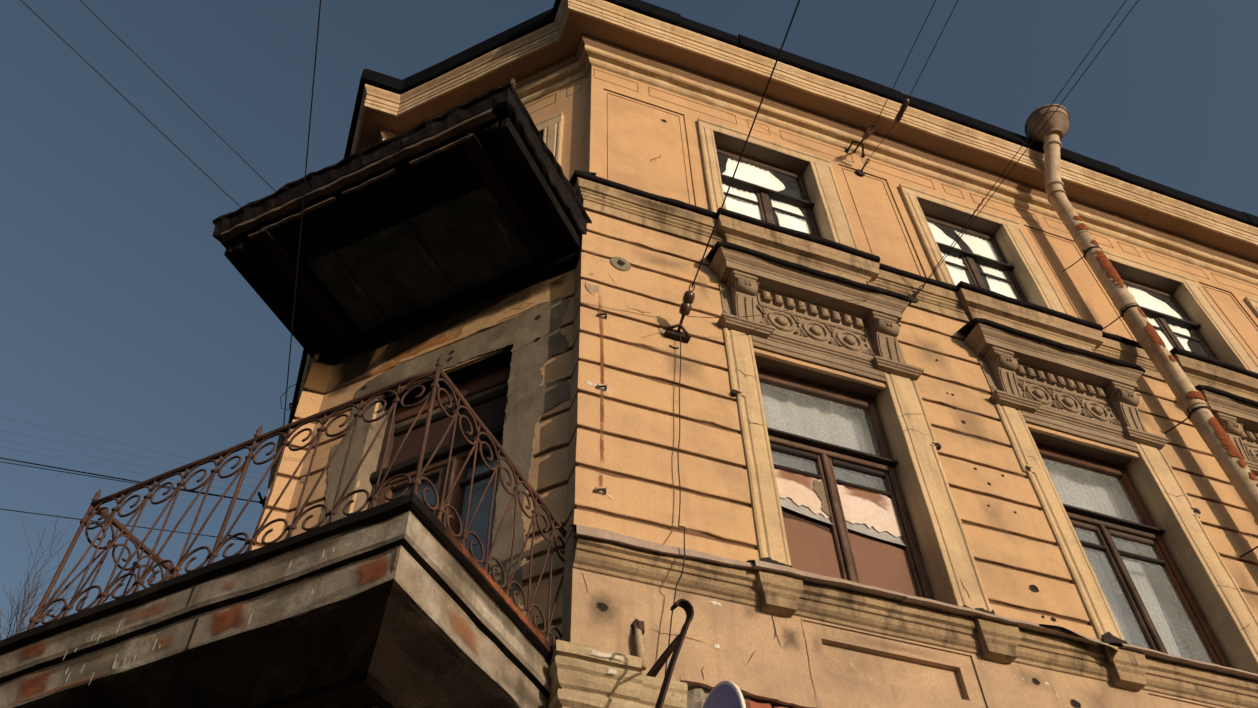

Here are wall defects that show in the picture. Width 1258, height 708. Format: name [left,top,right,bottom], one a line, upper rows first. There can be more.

corrosion [1073,215,1125,288]
peeling [370,329,462,376]
corrosion [1138,307,1176,368]
corrosion [1185,390,1258,485]